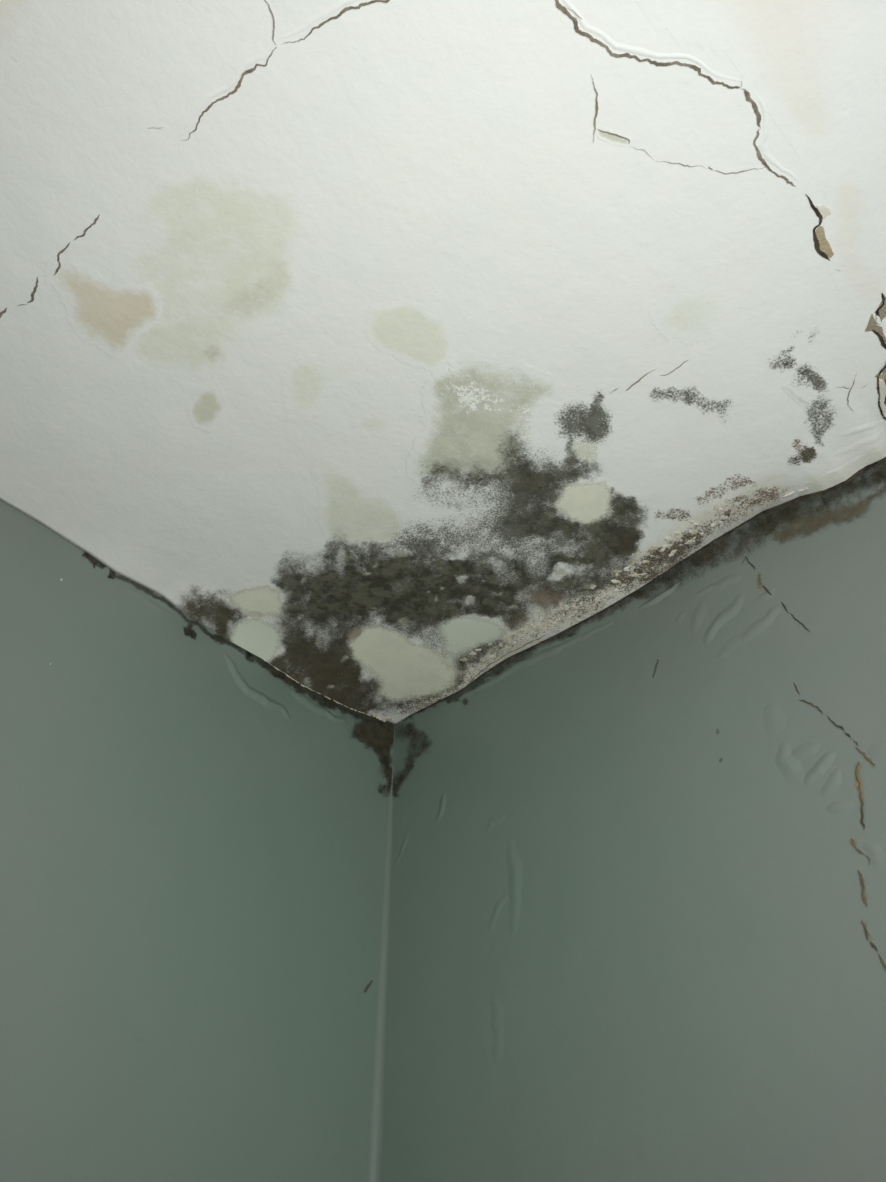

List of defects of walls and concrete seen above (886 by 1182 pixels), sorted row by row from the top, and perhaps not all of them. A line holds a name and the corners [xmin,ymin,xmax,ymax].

crack [159,0,390,140]
crack [555,0,834,260]
crack [0,215,100,318]
damp [43,162,324,433]
damp [83,301,886,796]
peeling [782,364,886,498]
spalling [865,293,886,349]
crack [793,682,886,969]